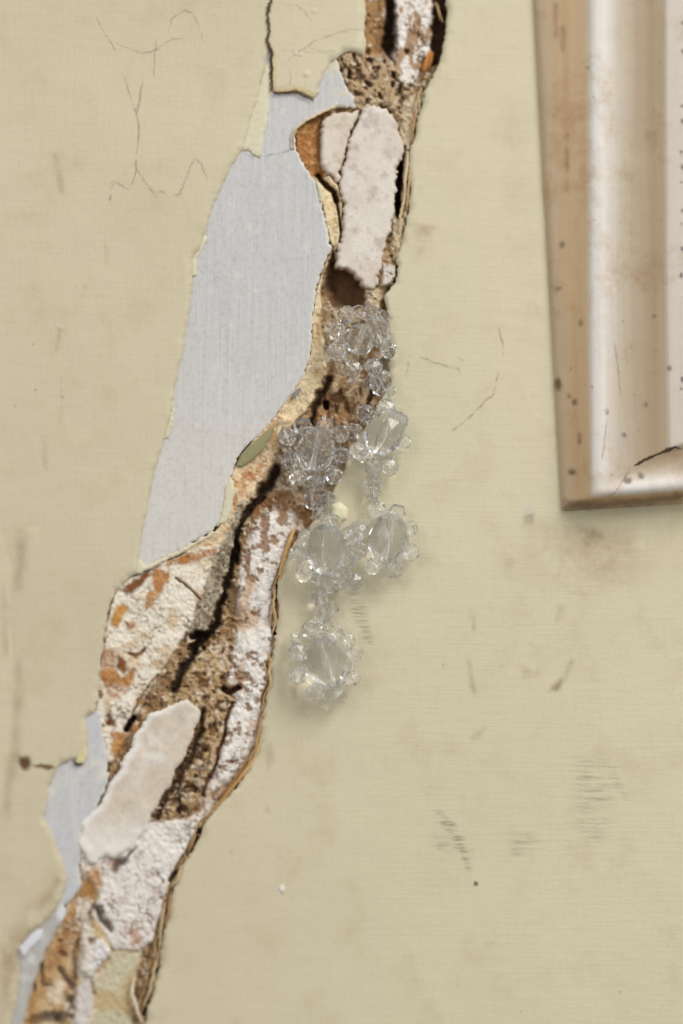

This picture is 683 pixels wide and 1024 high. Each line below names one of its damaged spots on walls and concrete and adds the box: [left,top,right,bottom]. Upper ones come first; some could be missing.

peeling [11,51,358,1024]
crack [34,0,448,1024]